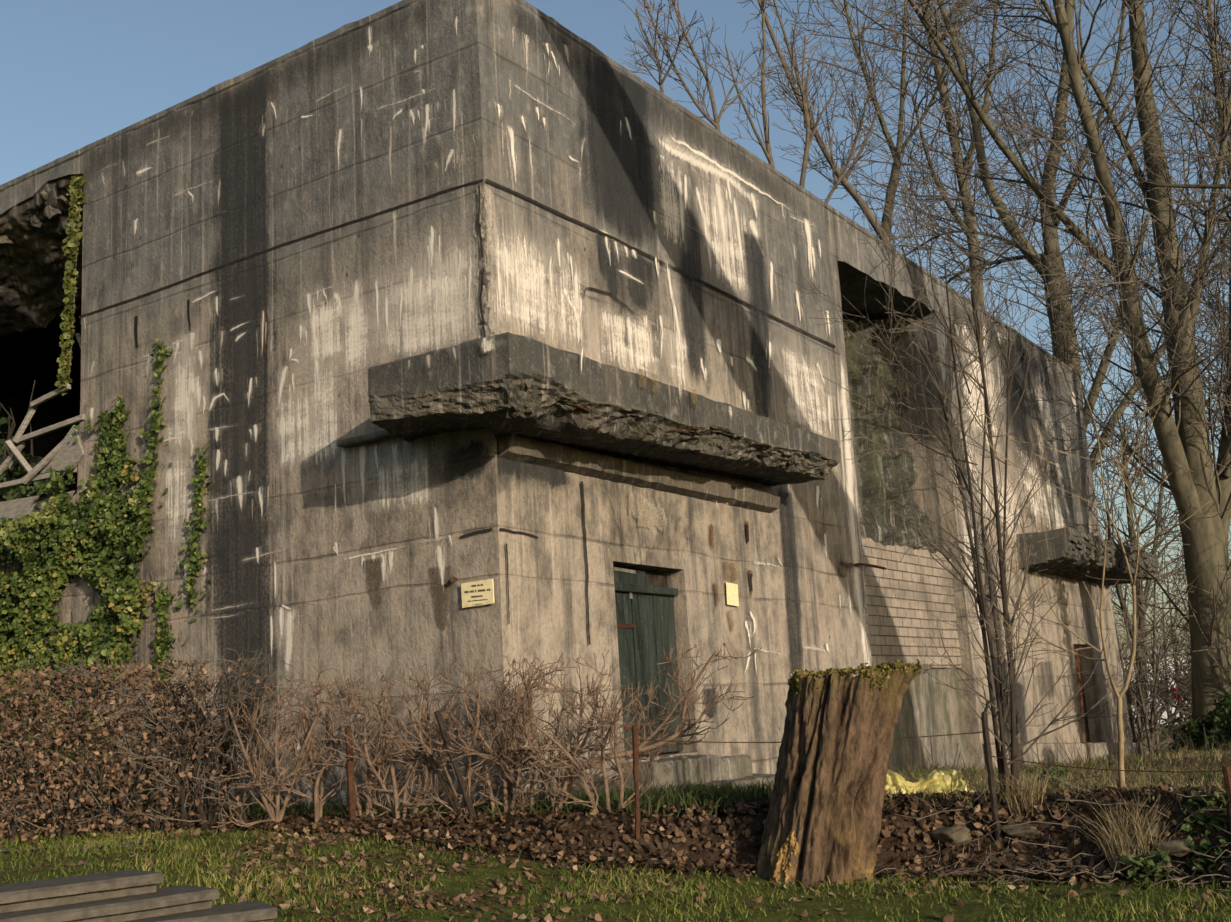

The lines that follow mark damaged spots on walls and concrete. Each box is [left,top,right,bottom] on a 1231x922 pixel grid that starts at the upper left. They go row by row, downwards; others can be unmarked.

damp [308,23,394,69]
spalling [0,234,14,244]
spalling [29,190,67,228]
damp [87,150,151,183]
crack [79,178,836,348]
damp [493,233,584,370]
damp [518,13,870,675]
damp [141,66,566,798]
spalling [401,376,834,480]